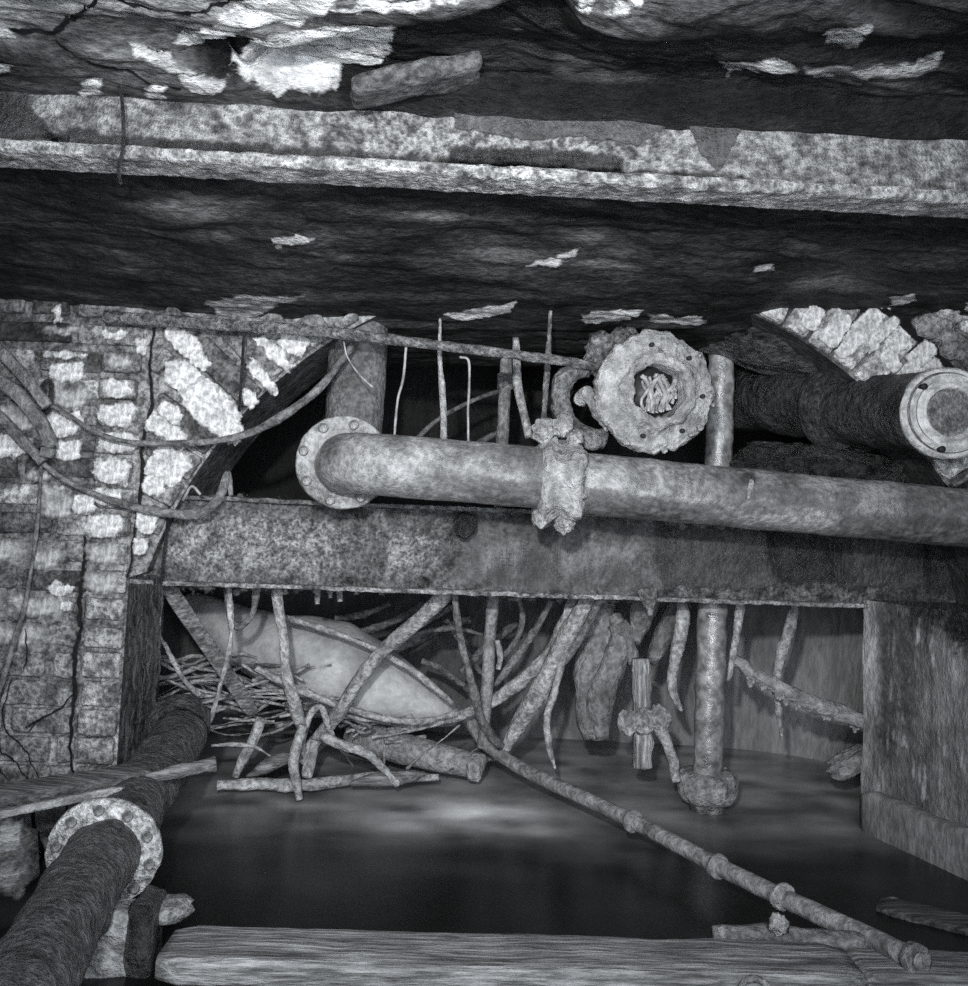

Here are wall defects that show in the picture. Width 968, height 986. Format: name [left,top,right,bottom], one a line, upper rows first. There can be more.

crack [6,0,242,90]
crack [126,328,155,577]
corrosion [442,478,542,507]
leakage [0,540,66,569]
corrosion [458,474,839,616]
corrosion [826,491,968,590]
leakage [0,594,72,650]